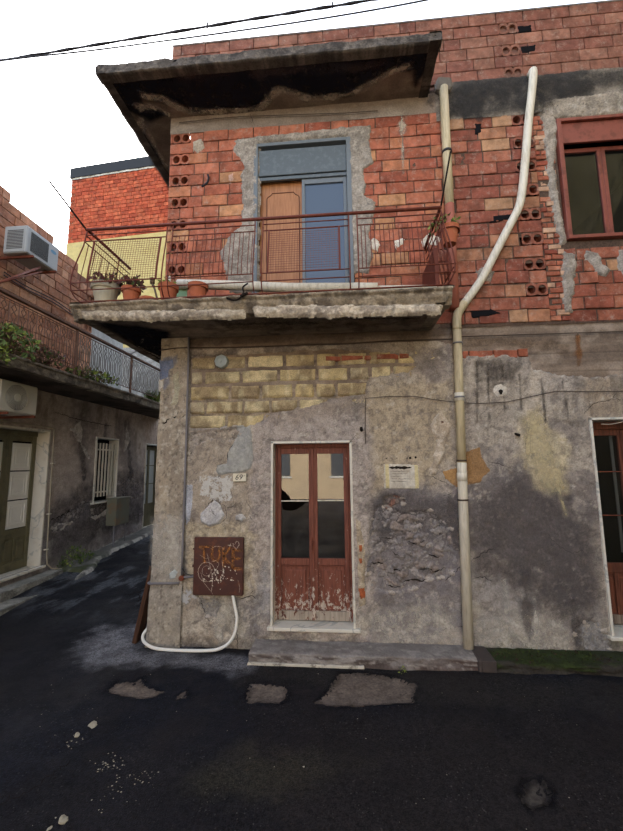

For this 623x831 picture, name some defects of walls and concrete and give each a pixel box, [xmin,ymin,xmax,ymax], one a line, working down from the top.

spalling [81,304,443,323]
spalling [470,309,500,318]
flaking render [356,495,461,606]
leakage [474,389,599,649]